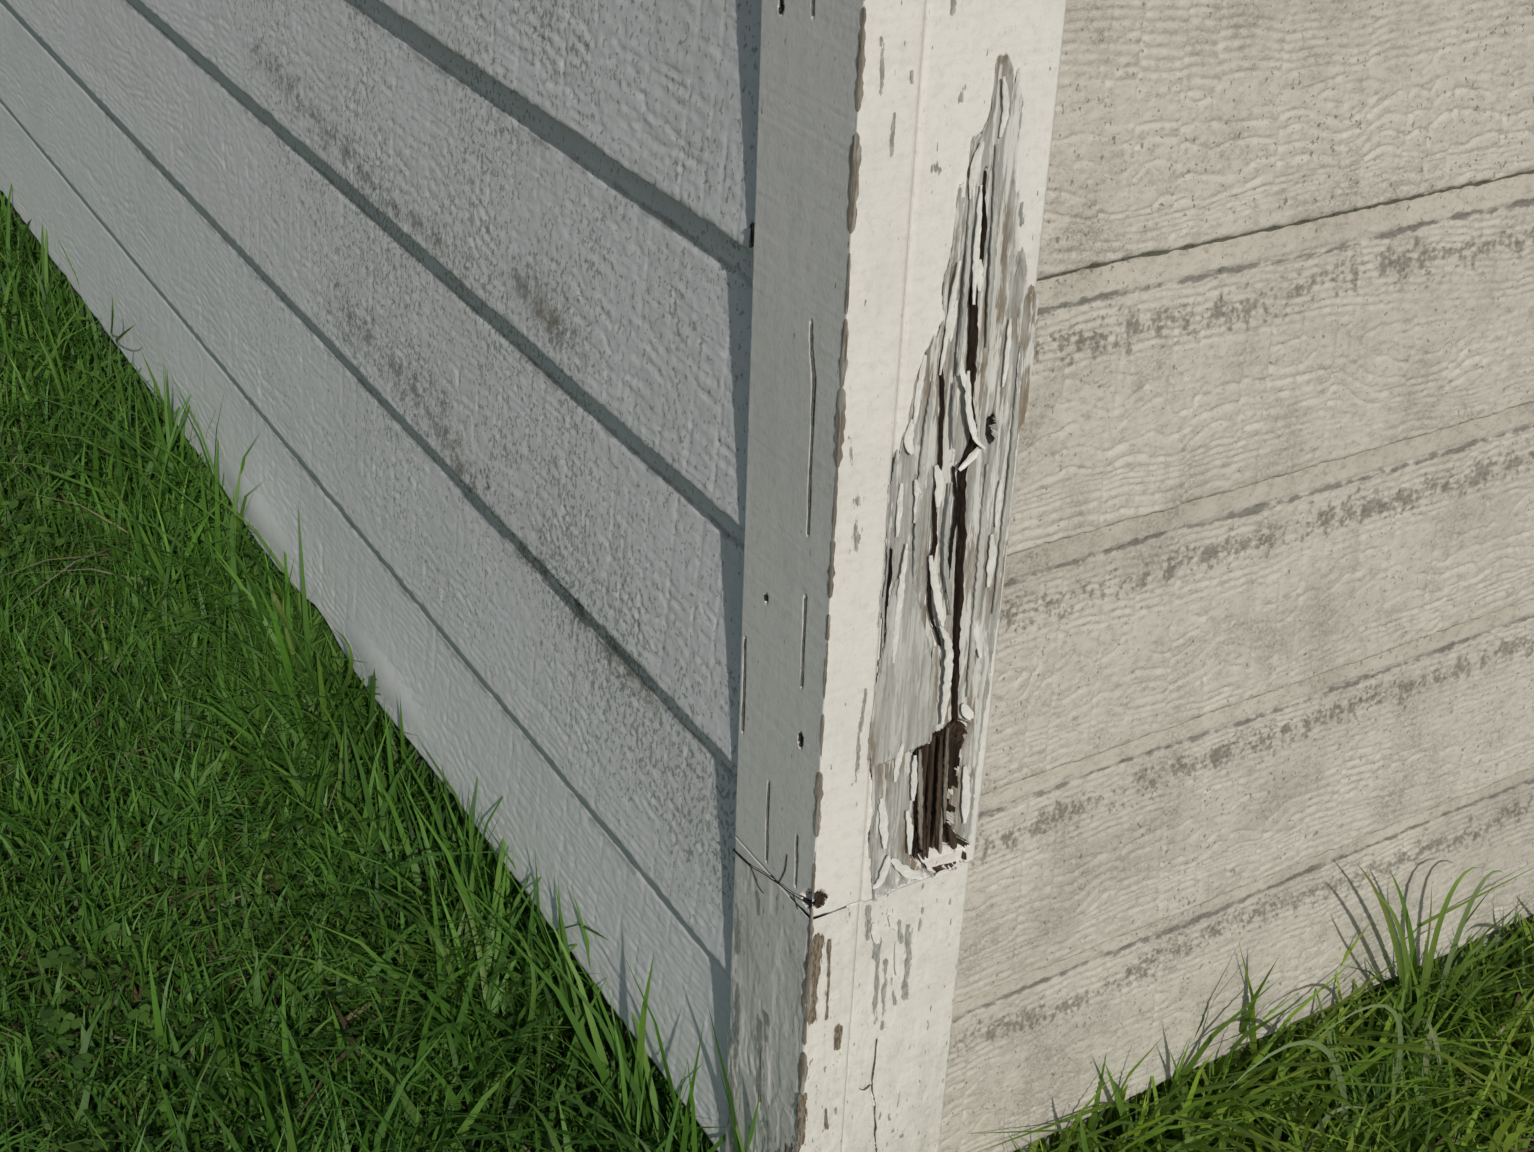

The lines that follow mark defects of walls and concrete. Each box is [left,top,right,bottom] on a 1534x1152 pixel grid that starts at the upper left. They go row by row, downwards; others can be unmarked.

spalling [855,0,885,112]
spalling [847,133,862,234]
peeling [852,55,1039,1031]
spalling [795,253,863,1152]
crack [859,1039,878,1152]